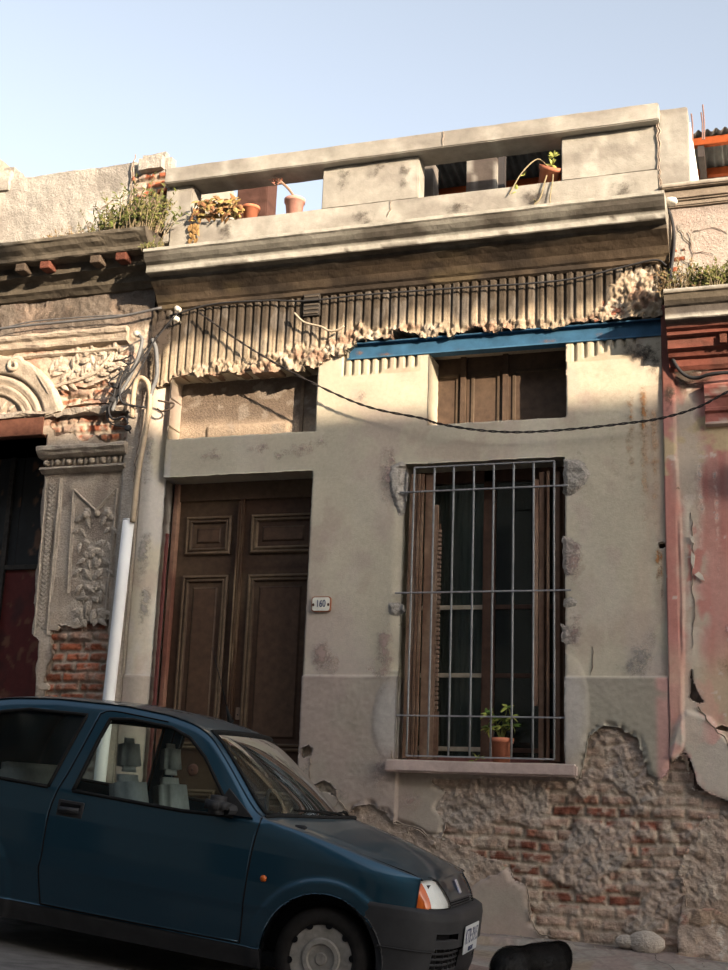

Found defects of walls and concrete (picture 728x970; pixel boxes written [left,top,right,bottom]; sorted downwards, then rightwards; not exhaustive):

spalling [591,282,651,323]
spalling [0,380,129,443]
crack [689,513,697,644]
spalling [38,617,109,699]
crack [690,671,728,747]
flaking render [316,781,336,795]
spalling [348,726,728,952]